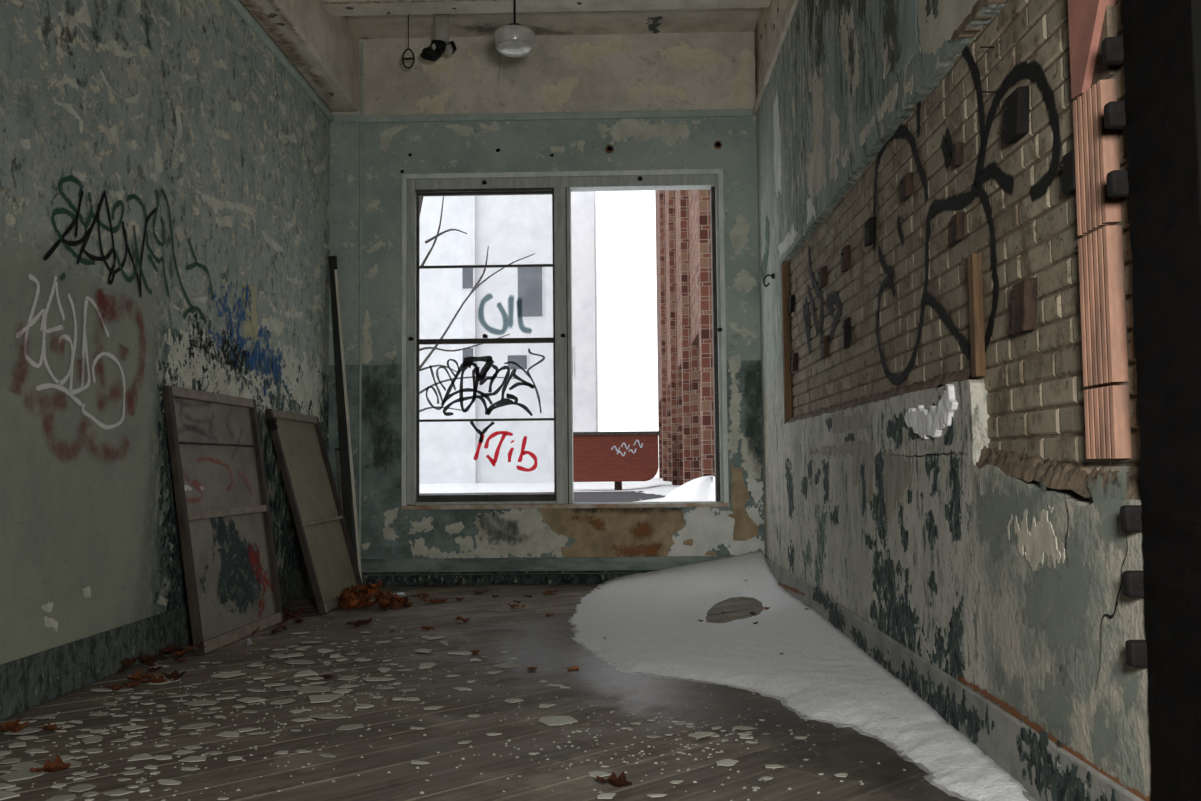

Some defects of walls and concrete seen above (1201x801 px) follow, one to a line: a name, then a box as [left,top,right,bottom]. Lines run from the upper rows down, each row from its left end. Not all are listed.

peeling [57,0,137,59]
peeling [148,106,284,252]
peeling [416,47,500,136]
peeling [598,118,700,153]
peeling [773,90,782,197]
peeling [778,0,1006,261]
spalling [383,354,765,558]
spalling [785,407,995,744]
peeling [976,479,1065,571]
peeling [1089,466,1129,558]
spalling [752,764,784,789]
peeling [995,667,1117,801]